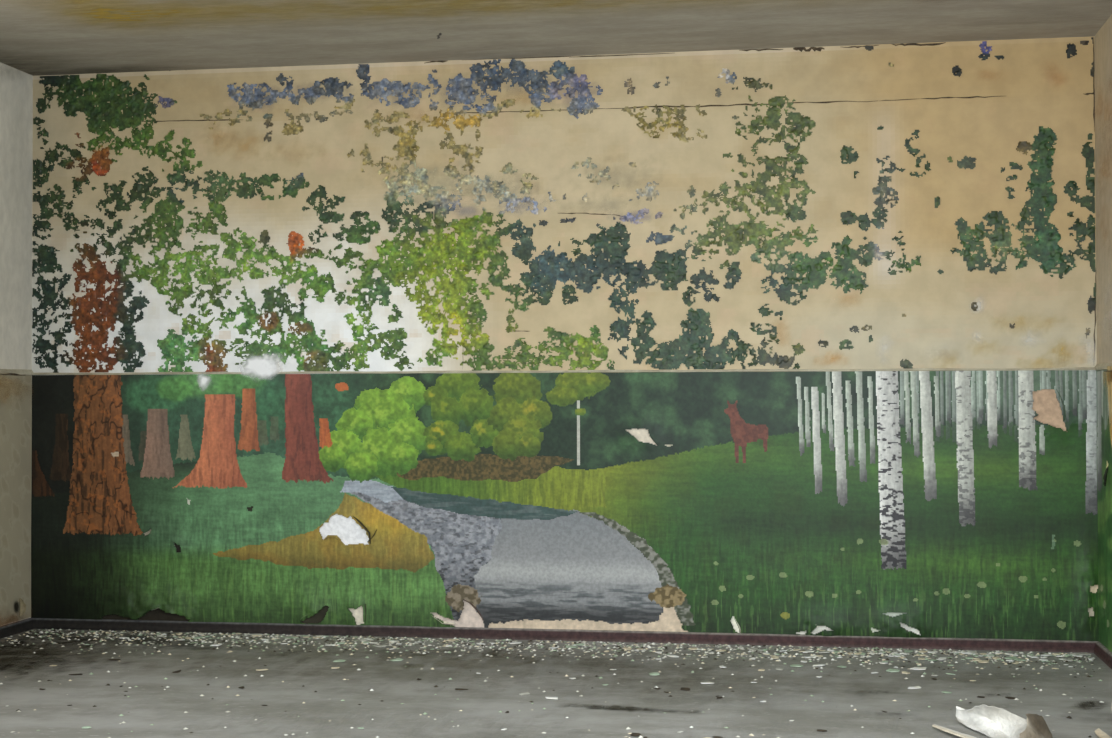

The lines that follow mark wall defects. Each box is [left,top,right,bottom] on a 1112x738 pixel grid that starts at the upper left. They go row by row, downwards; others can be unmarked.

peeling [978,41,1004,60]
peeling [1066,37,1094,58]
peeling [32,59,931,388]
peeling [947,126,1096,314]
flaking render [320,514,369,545]
flaking render [430,599,688,632]